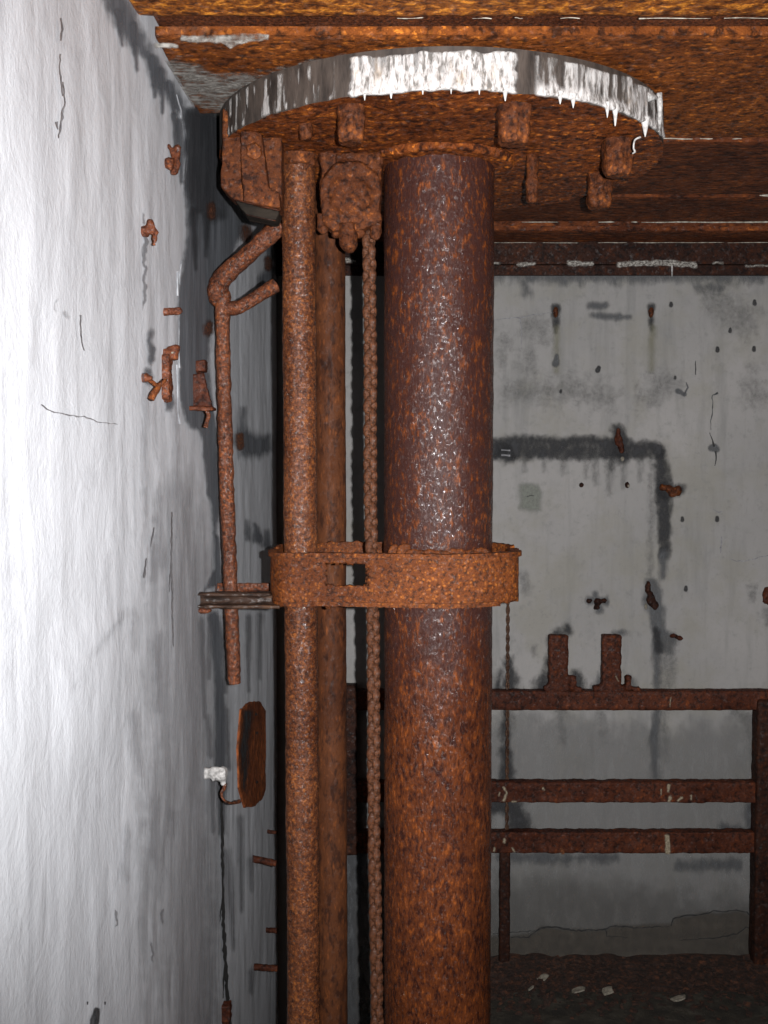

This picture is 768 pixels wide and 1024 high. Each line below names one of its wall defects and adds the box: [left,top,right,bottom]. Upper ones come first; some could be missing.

crack [56,18,66,138]
damp [347,50,518,101]
damp [535,56,713,154]
corrosion [552,304,560,333]
crack [42,405,118,425]
crack [709,392,719,464]
damp [493,425,684,689]